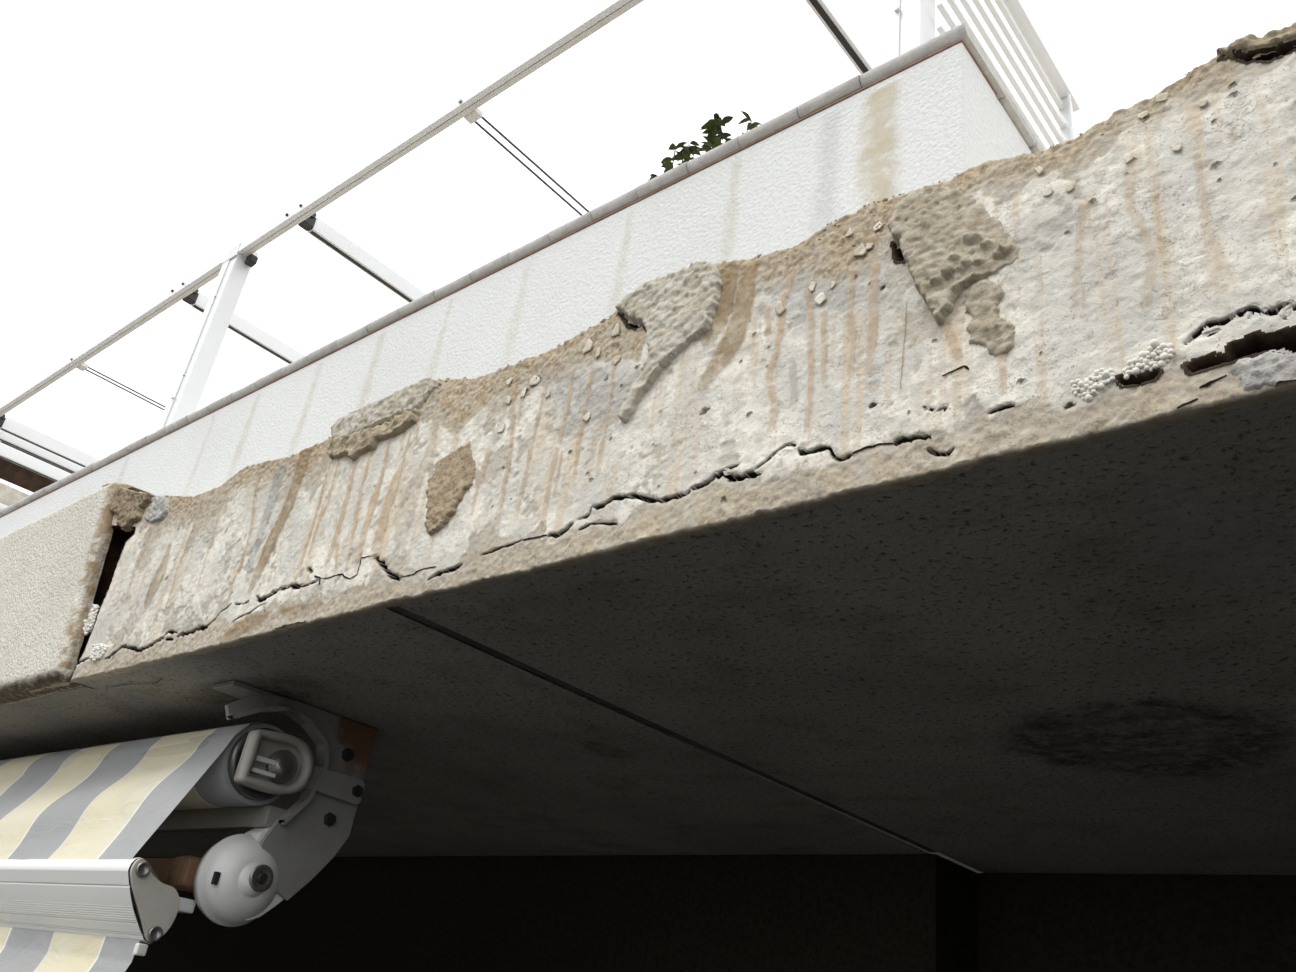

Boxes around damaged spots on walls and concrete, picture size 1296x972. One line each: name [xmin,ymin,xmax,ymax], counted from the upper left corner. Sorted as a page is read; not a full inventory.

peeling [813,193,907,256]
rust [501,367,546,500]
rust [544,371,593,501]
peeling [581,312,647,387]
rust [703,260,827,401]
crack [988,403,1015,416]
crack [1177,374,1228,411]
crack [1184,301,1296,345]
spalling [102,483,170,532]
rust [305,427,419,568]
spalling [421,441,476,536]
crack [75,302,970,688]